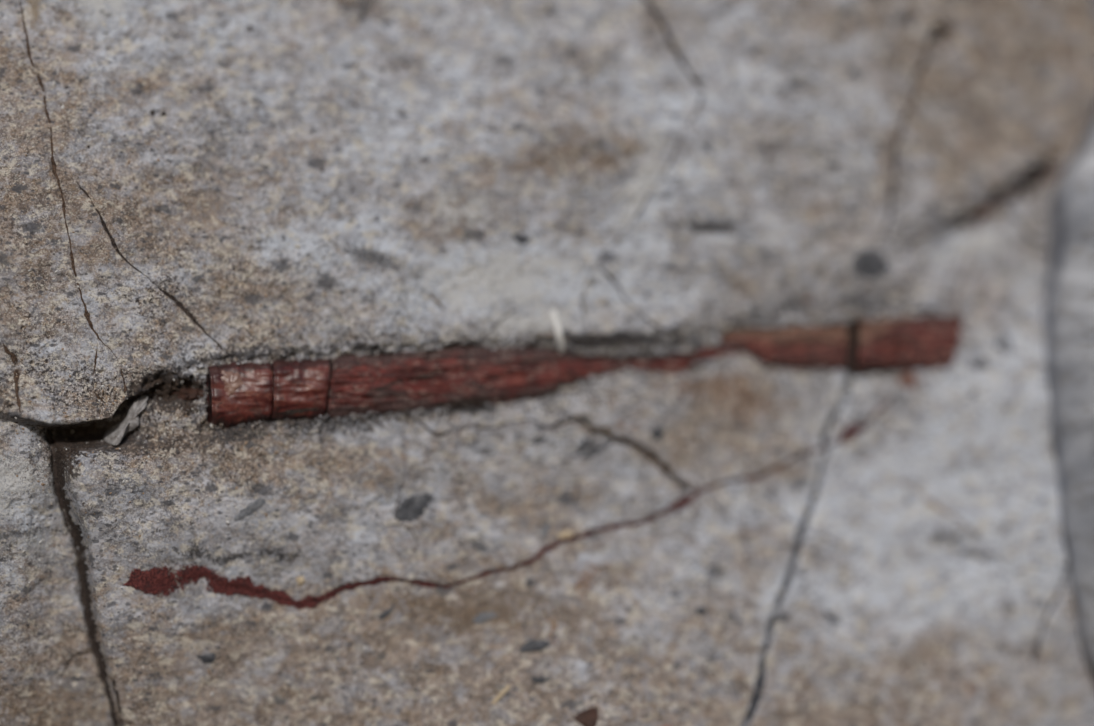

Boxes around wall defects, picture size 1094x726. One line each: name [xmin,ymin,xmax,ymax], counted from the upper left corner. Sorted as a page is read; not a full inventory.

crack [20,1,224,402]
crack [581,0,752,334]
crack [3,343,21,413]
crack [47,426,123,726]
spalling [43,374,207,480]
crack [334,408,823,589]
spalling [649,426,664,441]